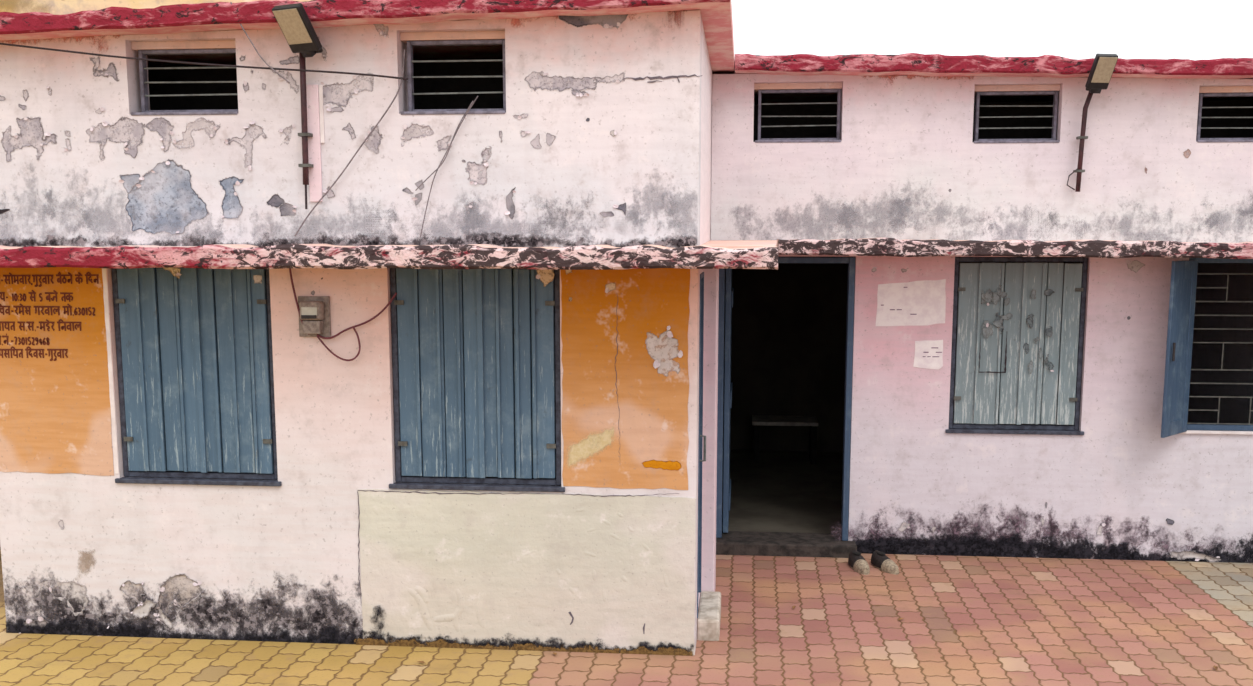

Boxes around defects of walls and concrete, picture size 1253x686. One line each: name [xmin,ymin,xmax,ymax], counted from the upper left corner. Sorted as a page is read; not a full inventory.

peeling [90,55,119,81]
peeling [524,71,625,97]
peeling [0,90,71,162]
peeling [86,107,297,235]
peeling [321,73,383,154]
peeling [402,180,424,206]
peeling [401,123,452,151]
peeling [462,131,502,185]
peeling [504,187,516,219]
peeling [646,326,683,377]
leakage [839,505,1253,563]
leakage [4,573,694,656]